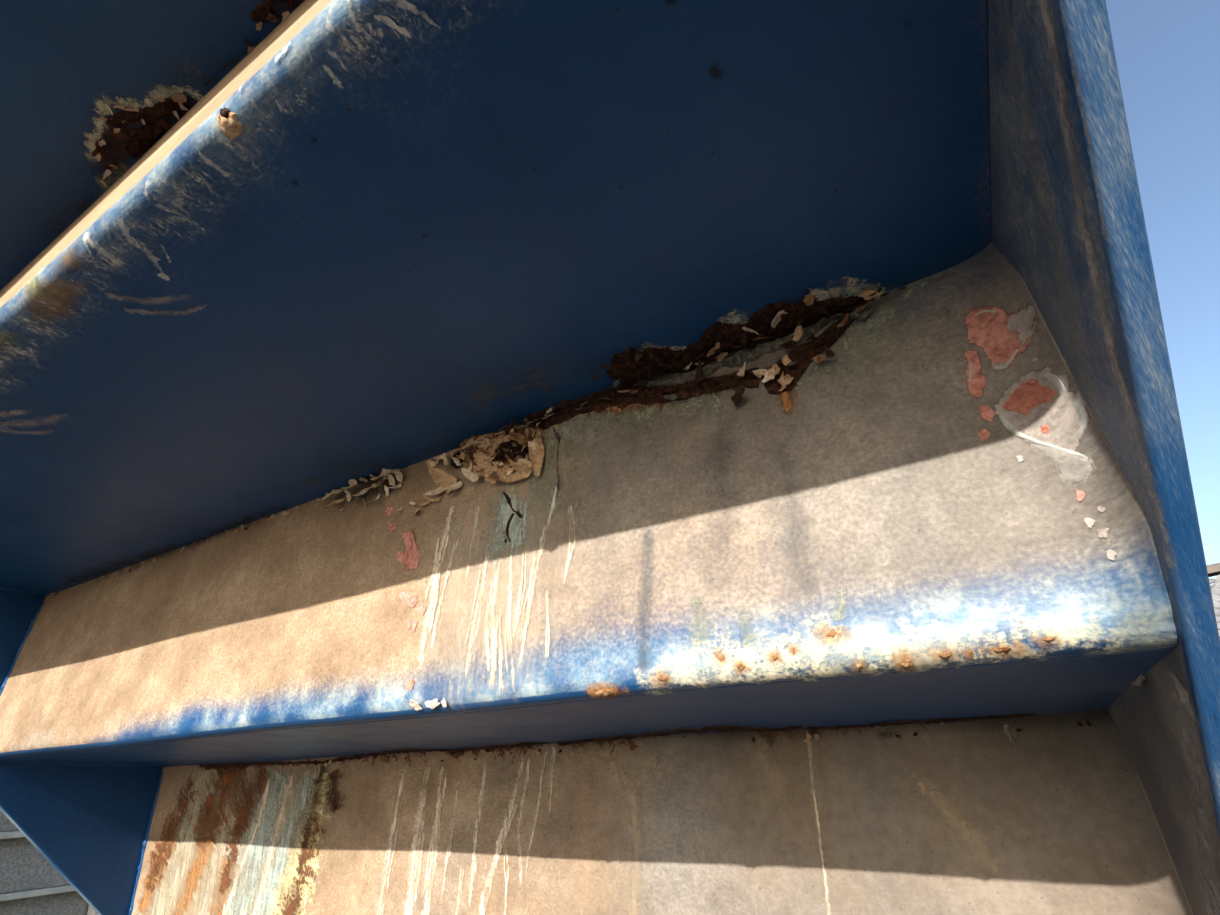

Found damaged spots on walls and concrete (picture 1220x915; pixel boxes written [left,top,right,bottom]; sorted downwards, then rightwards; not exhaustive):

rust [78,0,300,210]
peeling [964,301,1096,501]
peeling [48,506,299,597]
peeling [316,420,540,570]
peeling [1084,506,1117,560]
rust [587,589,1120,698]
rust [137,713,1037,915]